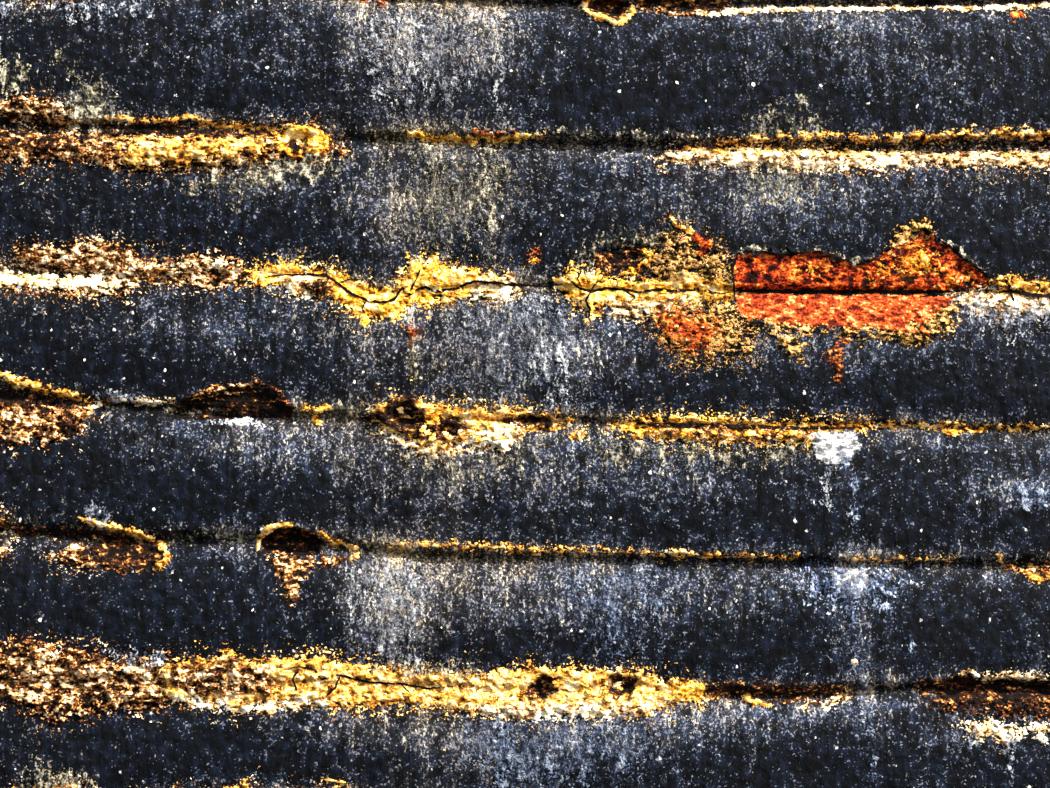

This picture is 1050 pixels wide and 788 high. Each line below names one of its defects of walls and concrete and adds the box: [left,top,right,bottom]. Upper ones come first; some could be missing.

peeling [637,94,932,216]
crack [259,269,734,319]
rust [0,224,1050,485]
peeling [942,700,1034,735]